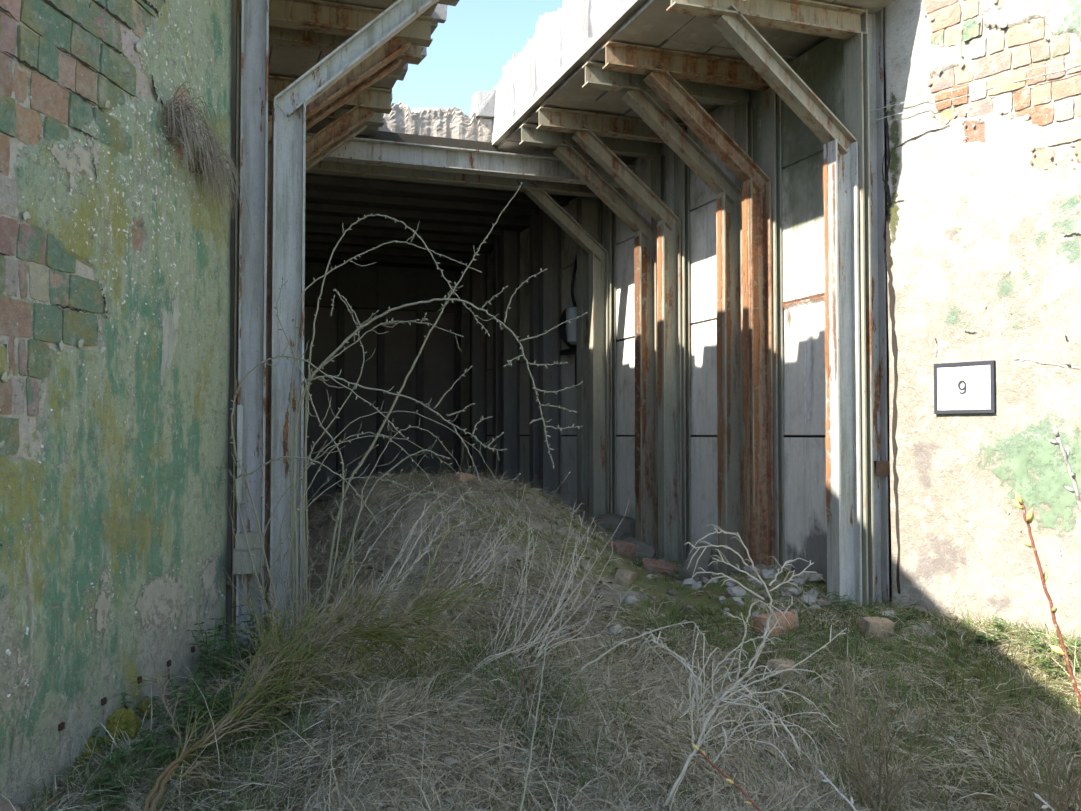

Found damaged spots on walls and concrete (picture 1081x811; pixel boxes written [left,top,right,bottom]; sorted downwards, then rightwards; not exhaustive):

flaking render [0,0,170,464]
corrosion [717,186,767,520]
corrosion [782,159,840,523]
crack [882,111,950,594]
flaking render [923,0,1081,171]
peeling [974,427,1081,537]